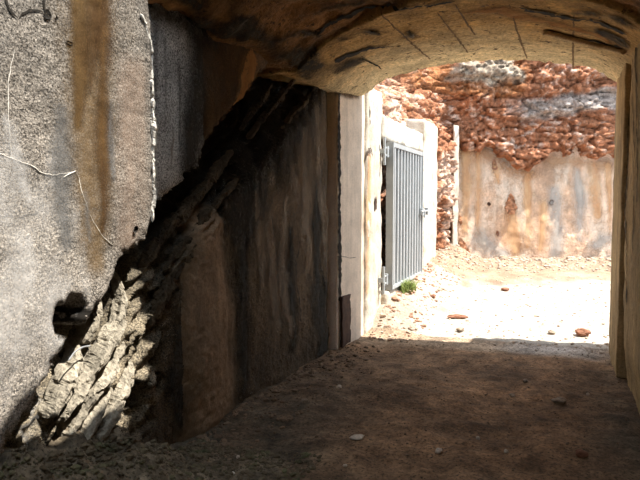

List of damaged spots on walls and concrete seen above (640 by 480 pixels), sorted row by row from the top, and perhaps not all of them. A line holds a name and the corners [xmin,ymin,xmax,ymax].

crack [0,50,113,245]
corrosion [70,0,112,267]
spalling [140,14,158,222]
spalling [136,150,239,330]
crack [509,4,626,68]
spalling [36,271,135,441]